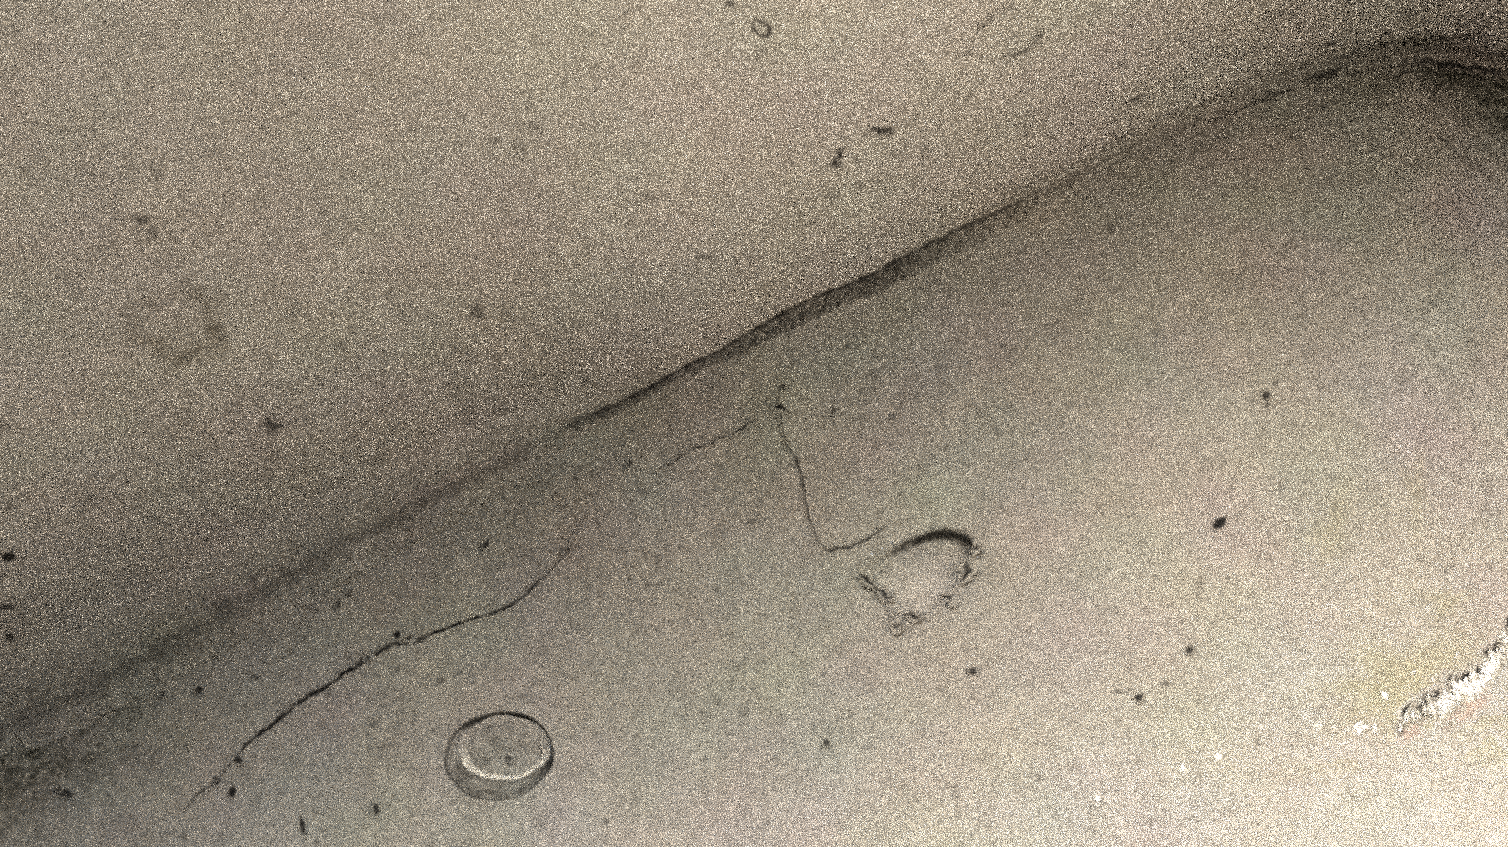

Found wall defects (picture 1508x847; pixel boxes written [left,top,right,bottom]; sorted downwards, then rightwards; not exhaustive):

crack [652,379,889,557]
crack [183,524,585,813]
peeling [849,522,985,637]
peeling [1313,614,1508,747]